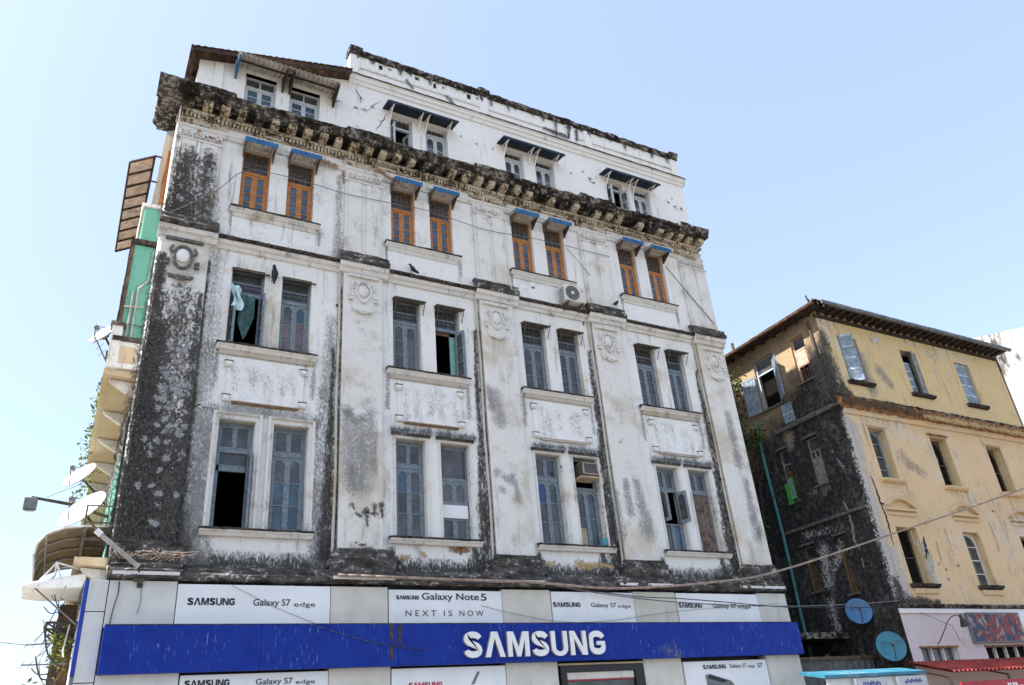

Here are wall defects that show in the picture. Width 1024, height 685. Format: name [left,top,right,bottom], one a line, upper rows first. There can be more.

damp [161,145,343,262]
damp [543,121,579,141]
damp [98,250,222,565]
damp [309,288,384,568]
damp [466,314,505,569]
damp [587,335,653,575]
damp [802,526,845,632]